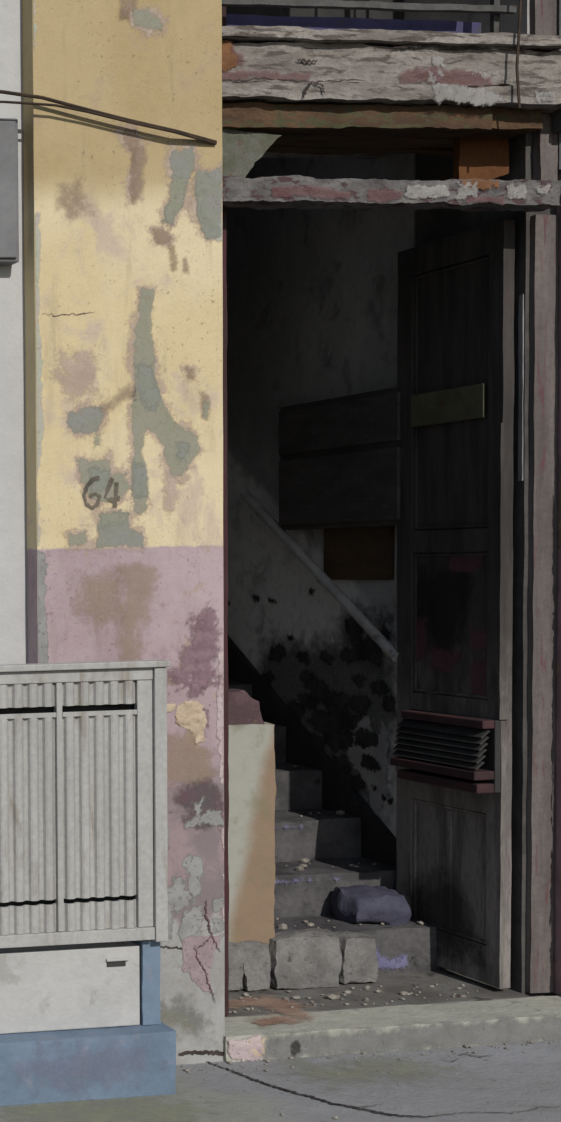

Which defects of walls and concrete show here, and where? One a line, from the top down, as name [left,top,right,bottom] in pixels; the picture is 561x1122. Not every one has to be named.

peeling [115,124,145,201]
spalling [150,141,222,249]
peeling [405,178,551,199]
peeling [65,285,203,552]
peeling [202,395,210,418]
peeling [167,602,230,785]
crack [160,900,219,1003]
peeling [168,855,224,992]
crack [179,1050,555,1117]